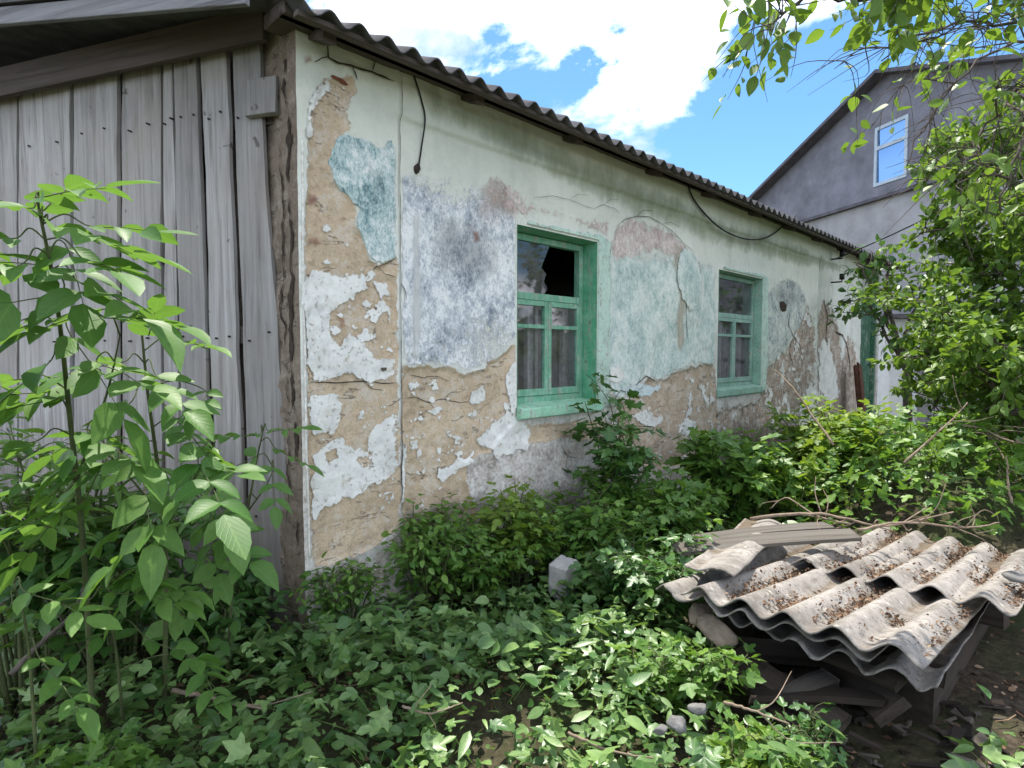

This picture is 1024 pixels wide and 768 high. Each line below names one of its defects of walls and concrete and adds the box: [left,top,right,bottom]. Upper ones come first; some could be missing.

flaking render [304,75,858,567]